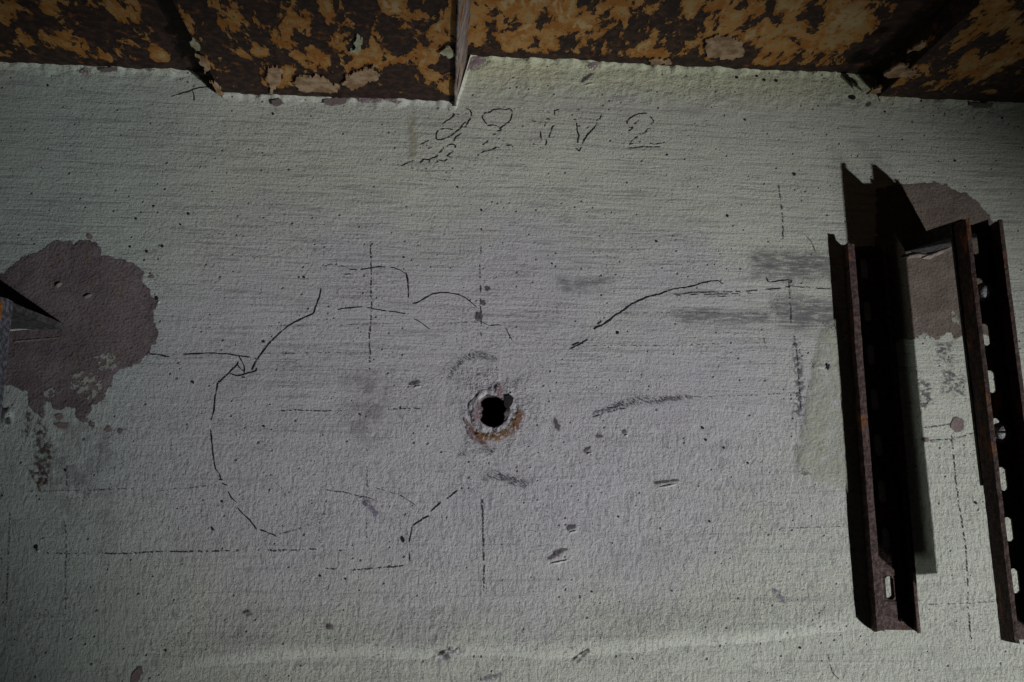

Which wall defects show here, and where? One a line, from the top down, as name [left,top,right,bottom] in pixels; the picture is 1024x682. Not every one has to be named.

rust [466,409,525,445]